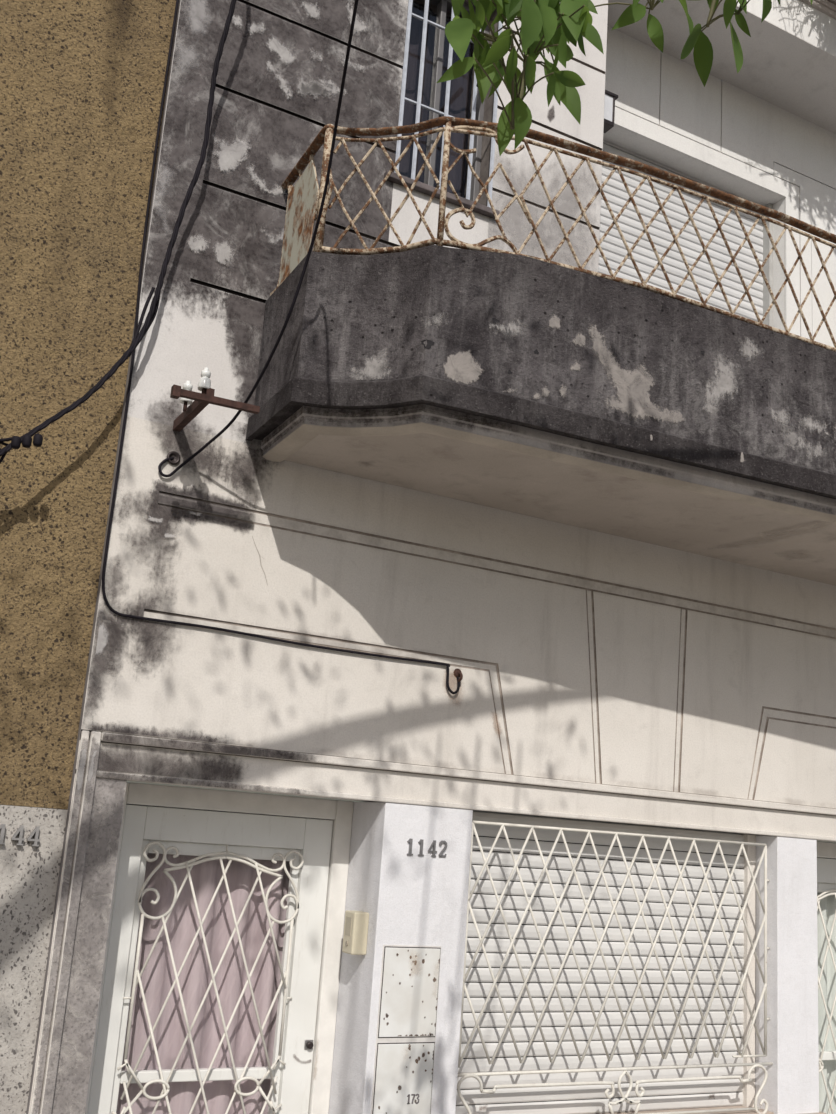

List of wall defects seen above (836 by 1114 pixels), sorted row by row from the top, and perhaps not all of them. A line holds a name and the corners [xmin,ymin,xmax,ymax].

water stain [123,0,422,576]
spalling [549,315,560,328]
spalling [443,350,483,385]
spalling [534,386,567,399]
spalling [574,325,684,423]
spalling [770,410,828,457]
water stain [110,559,122,599]
water stain [85,591,174,708]
water stain [32,724,312,1114]